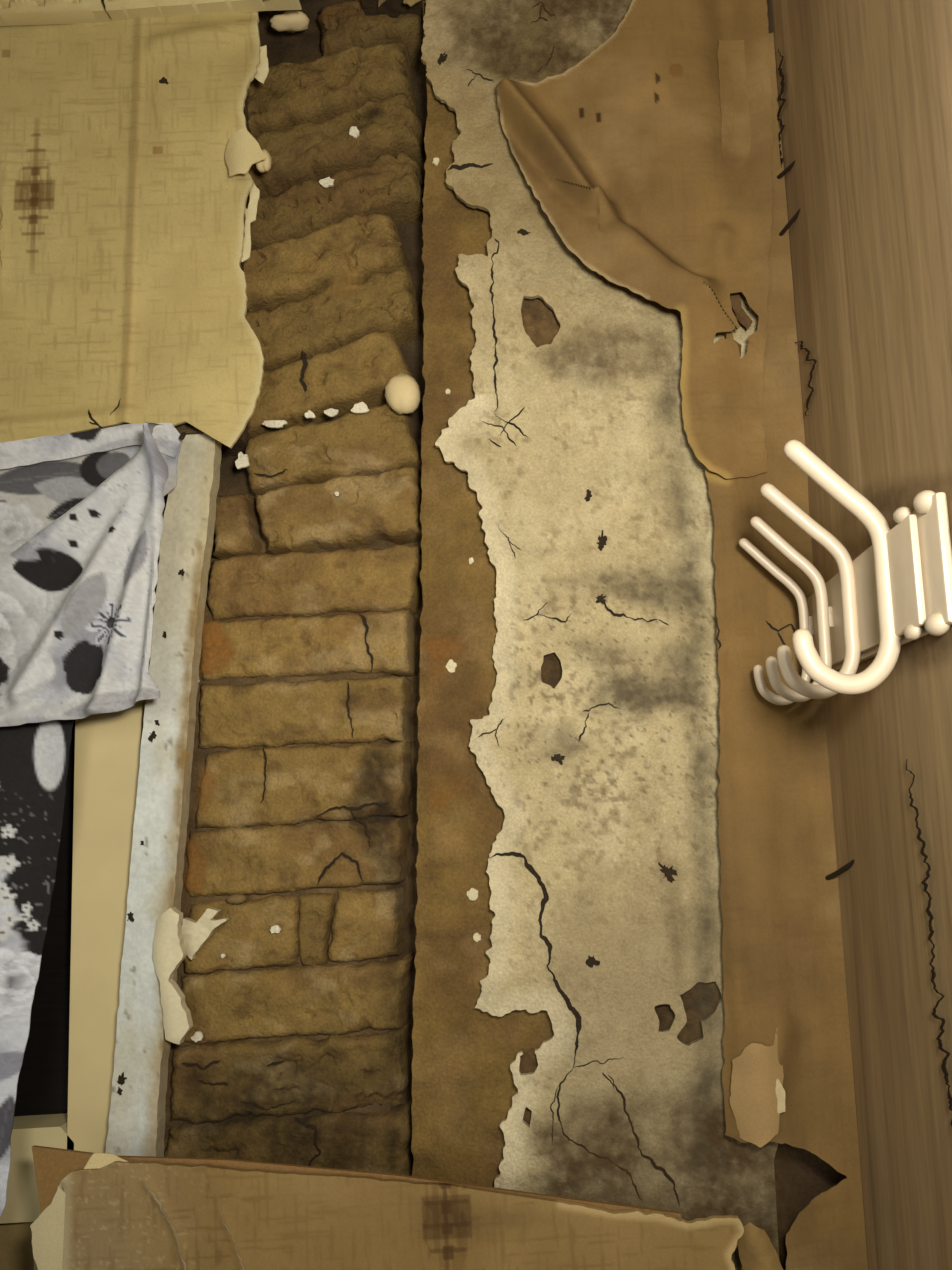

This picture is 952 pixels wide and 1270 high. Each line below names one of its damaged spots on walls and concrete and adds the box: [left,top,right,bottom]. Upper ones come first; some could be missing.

damp [472,0,626,78]
peeling [255,45,269,84]
peeling [241,179,260,262]
spalling [521,298,560,348]
spalling [597,530,607,551]
spalling [411,52,554,1187]
spalling [541,653,562,689]
spalling [658,862,678,883]
spalling [586,955,600,968]
crack [491,852,680,1206]
spalling [654,982,721,1044]